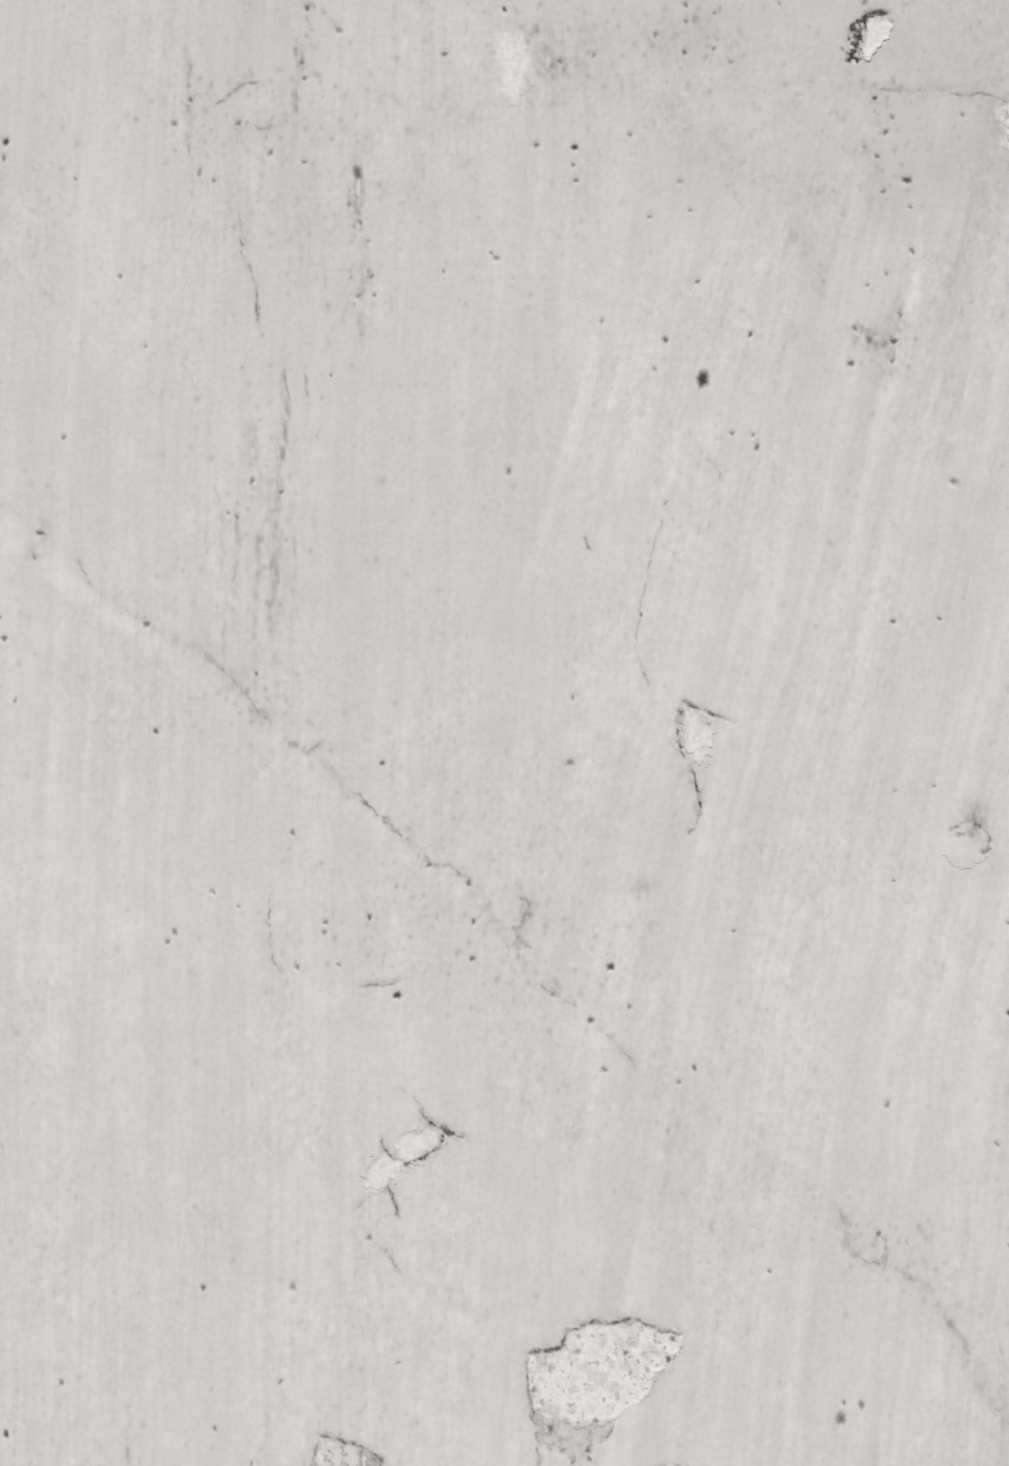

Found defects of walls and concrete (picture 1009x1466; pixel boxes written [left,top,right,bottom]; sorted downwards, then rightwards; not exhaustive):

spalling [848,2,894,63]
spalling [360,1121,462,1210]
spalling [524,1318,686,1461]
spalling [310,1435,382,1466]